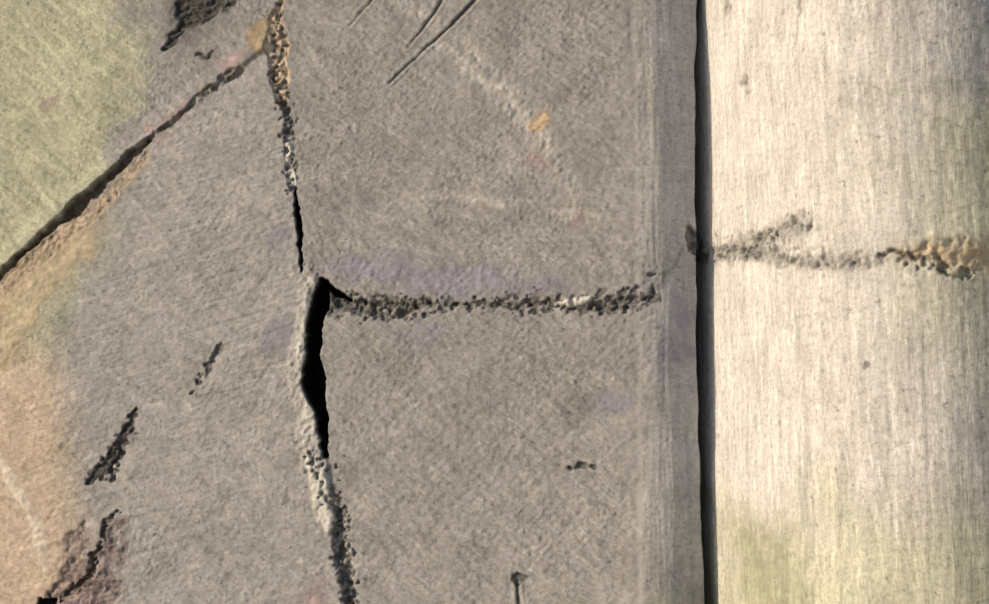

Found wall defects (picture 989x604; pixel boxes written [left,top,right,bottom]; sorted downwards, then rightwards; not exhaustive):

spalling [163,0,237,51]
crack [0,67,245,301]
crack [696,222,831,267]
crack [855,249,918,264]
crack [263,0,660,604]
spalling [86,408,138,485]
crack [0,449,48,573]
crack [66,522,108,594]